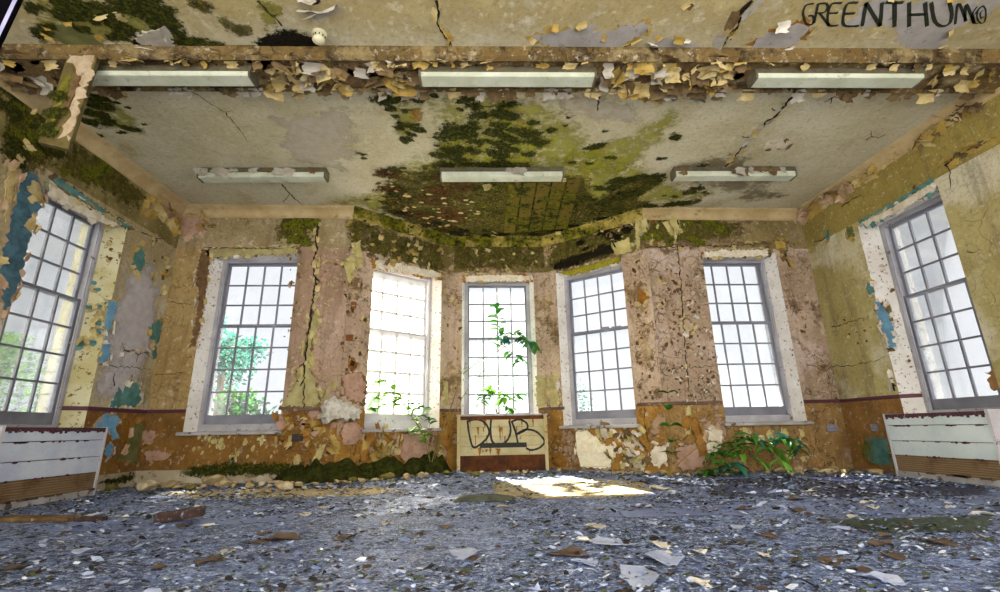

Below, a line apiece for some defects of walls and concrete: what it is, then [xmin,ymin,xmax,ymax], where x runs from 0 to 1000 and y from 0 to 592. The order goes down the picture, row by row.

peeling [0,49,59,95]
crack [429,0,454,47]
peeling [0,138,135,325]
damp [340,93,741,276]
crack [719,97,793,168]
peeling [845,178,937,242]
crack [282,184,321,407]
peeling [192,220,447,467]
peeling [566,216,726,472]
peeling [843,246,911,365]
peeling [93,375,174,466]
damp [179,459,312,479]